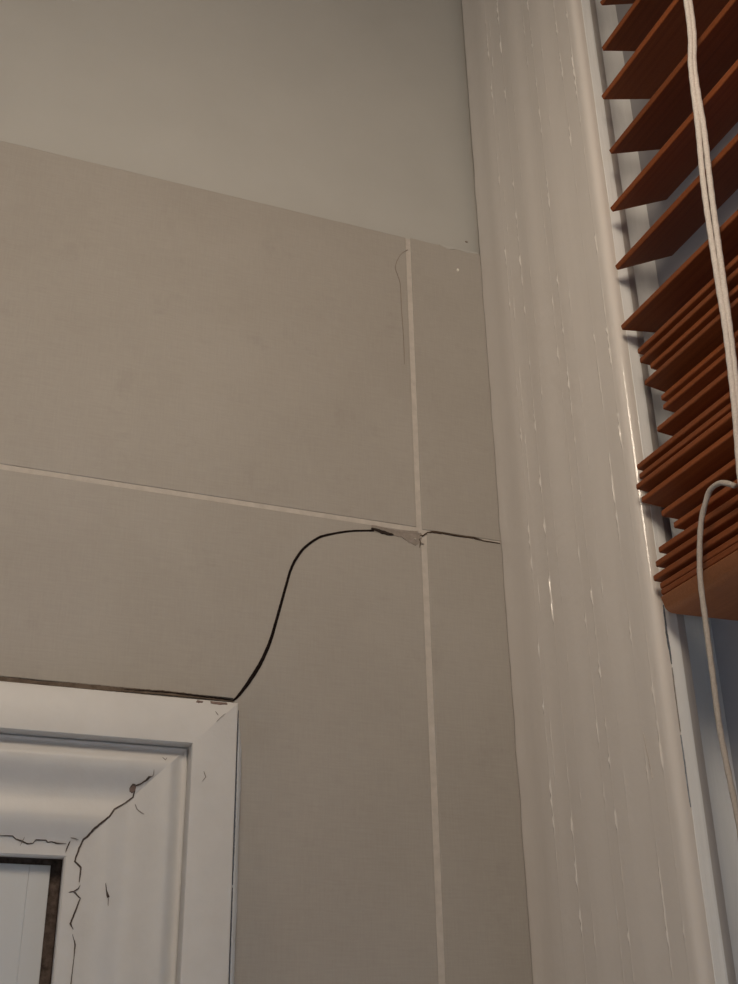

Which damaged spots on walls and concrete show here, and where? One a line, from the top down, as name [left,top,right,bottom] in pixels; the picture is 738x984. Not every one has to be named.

crack [0,530,374,984]
crack [419,531,500,548]